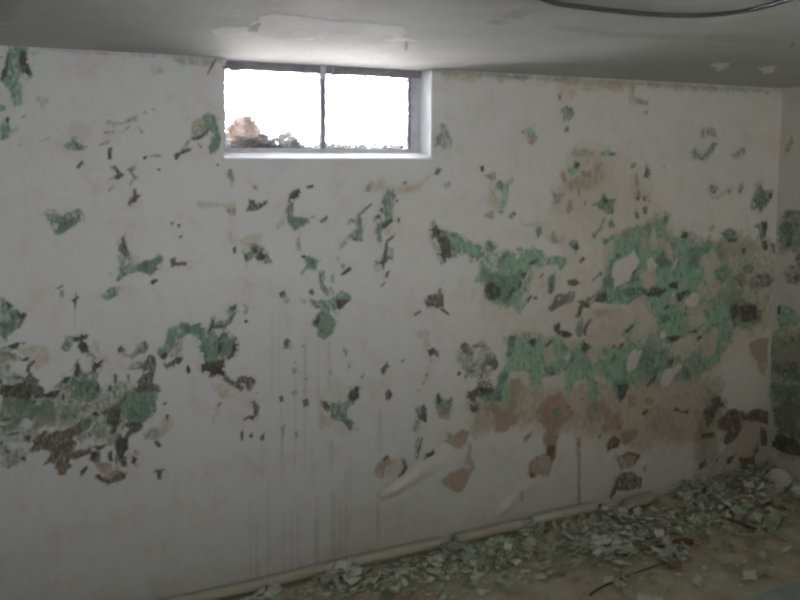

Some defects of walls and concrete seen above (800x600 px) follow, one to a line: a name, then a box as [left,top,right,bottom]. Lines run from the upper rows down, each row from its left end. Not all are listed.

peeling [0,46,39,147]
peeling [42,202,86,236]
peeling [62,132,89,170]
peeling [96,232,188,302]
peeling [107,110,238,208]
peeling [220,229,273,271]
peeling [245,184,271,213]
peeling [274,184,401,369]
damp [459,133,690,387]
peeling [374,85,800,500]
peeling [0,295,266,486]
peeling [325,372,366,432]